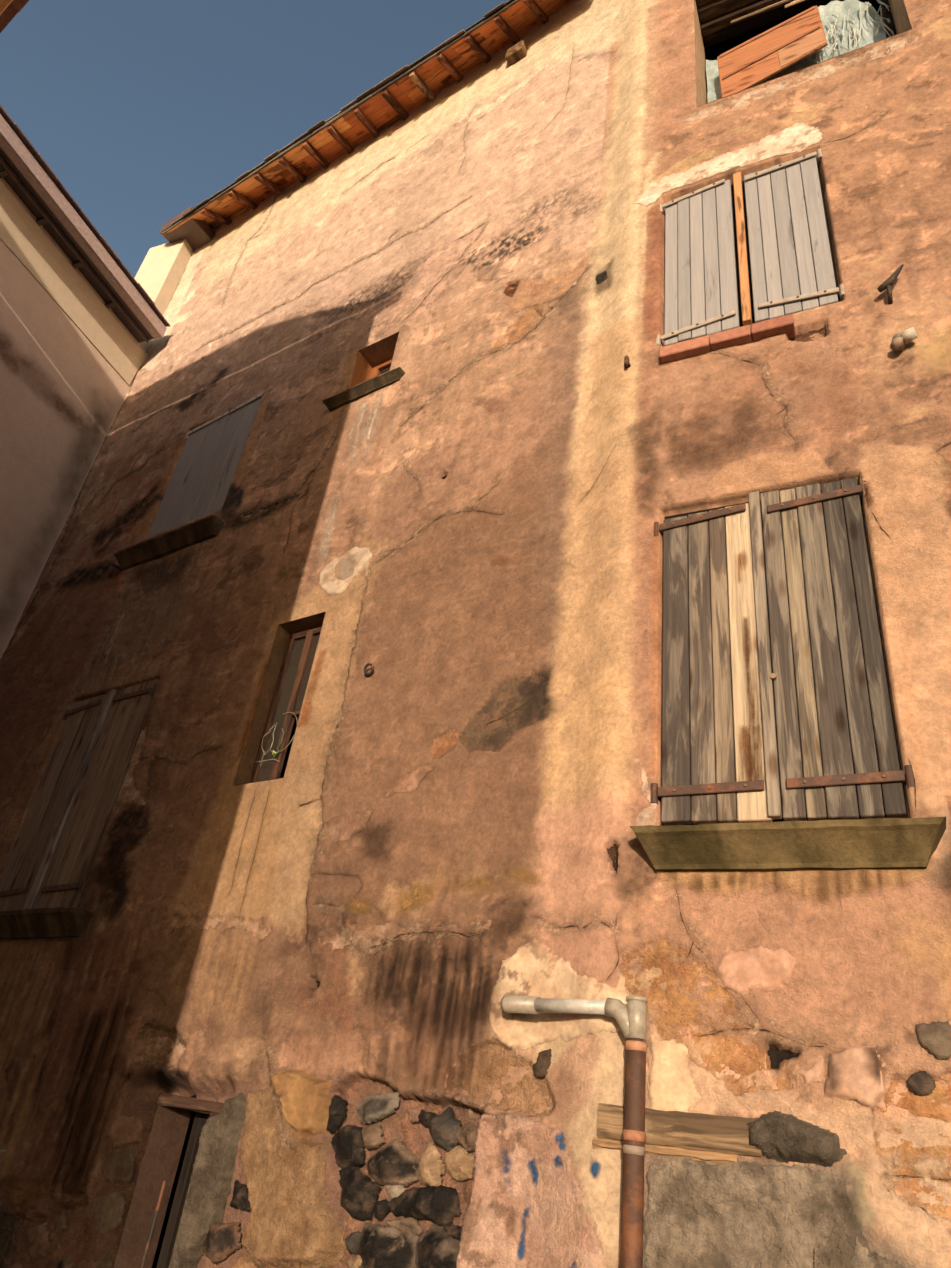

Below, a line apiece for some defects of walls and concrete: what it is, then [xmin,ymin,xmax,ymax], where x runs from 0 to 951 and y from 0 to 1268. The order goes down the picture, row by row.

crack [198,110,488,350]
crack [401,265,590,426]
crack [712,349,796,442]
crack [224,410,345,556]
leakage [57,485,202,687]
leakage [100,808,145,921]
leakage [52,1006,118,1187]
leakage [146,1067,183,1089]
flaking render [200,1180,251,1264]
leakage [377,943,490,1093]
flaking render [326,1041,555,1268]
flaking render [619,937,951,1233]